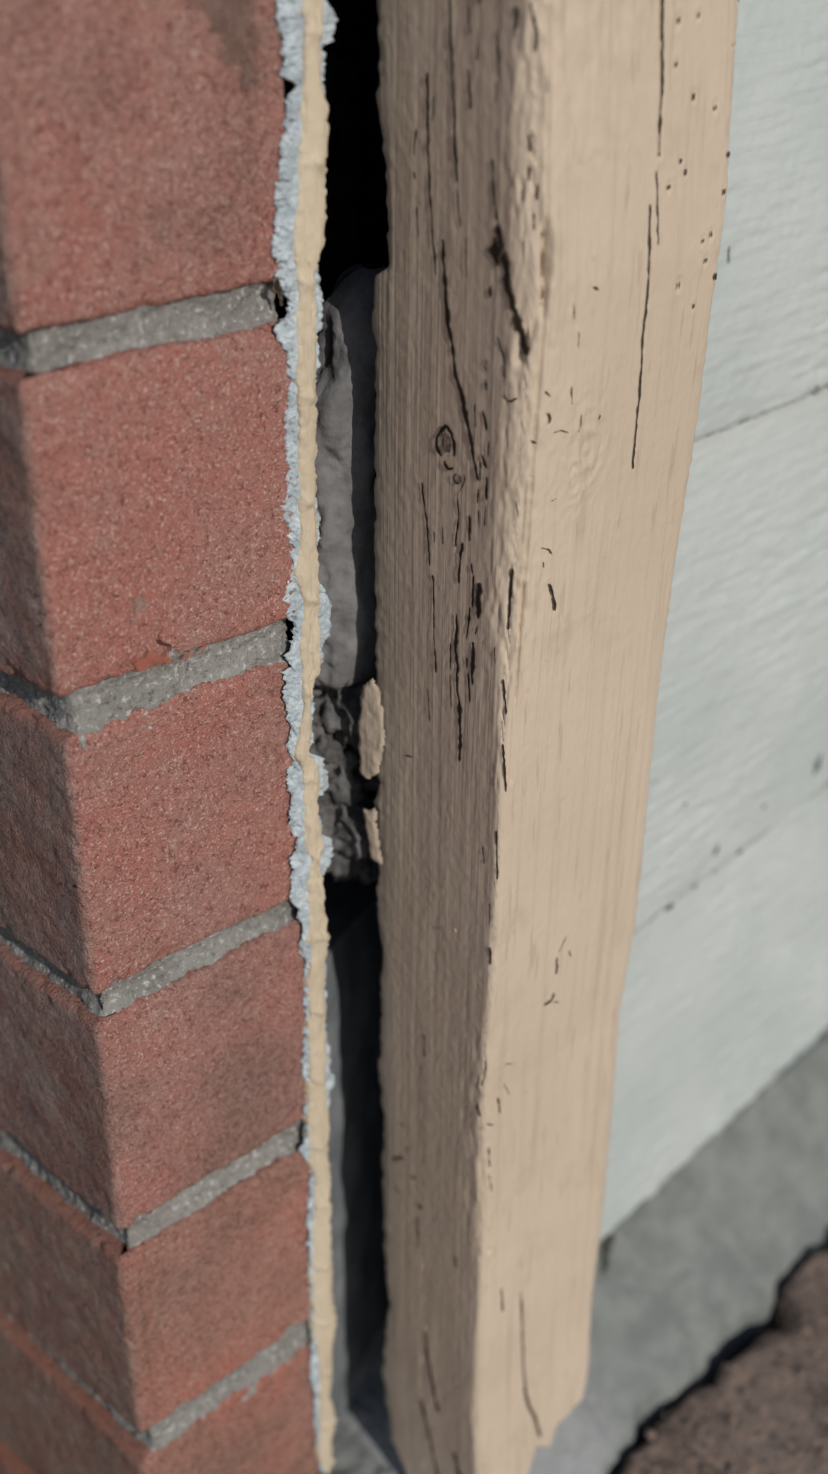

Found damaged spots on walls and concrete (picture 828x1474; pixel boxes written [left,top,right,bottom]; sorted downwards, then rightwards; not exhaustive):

peeling [320,0,338,94]
crack [632,0,664,469]
peeling [314,256,324,392]
crack [413,0,502,762]
crack [531,387,601,444]
peeling [317,584,332,664]
crack [542,548,557,611]
peeling [309,683,329,796]
peeling [358,678,386,779]
peeling [318,815,334,876]
peeling [363,807,383,865]
crack [420,1331,439,1474]